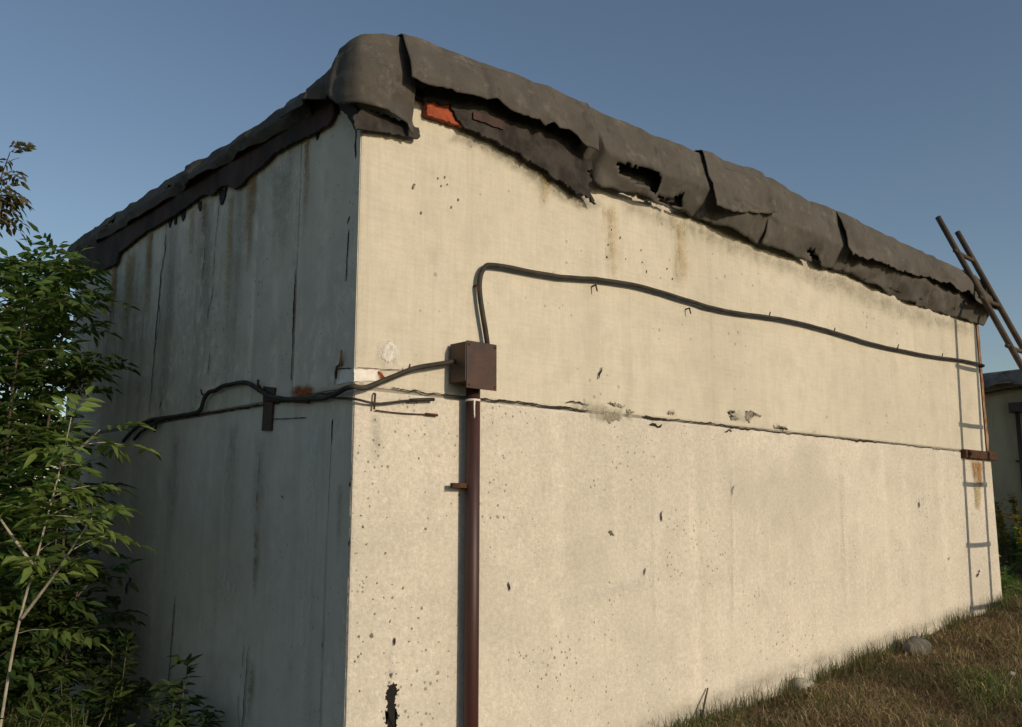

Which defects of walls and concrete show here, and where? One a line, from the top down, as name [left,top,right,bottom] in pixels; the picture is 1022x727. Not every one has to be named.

crack [149,216,352,422]
peeling [336,368,354,385]
spalling [584,401,634,424]
spalling [728,410,762,423]
crack [321,419,352,674]